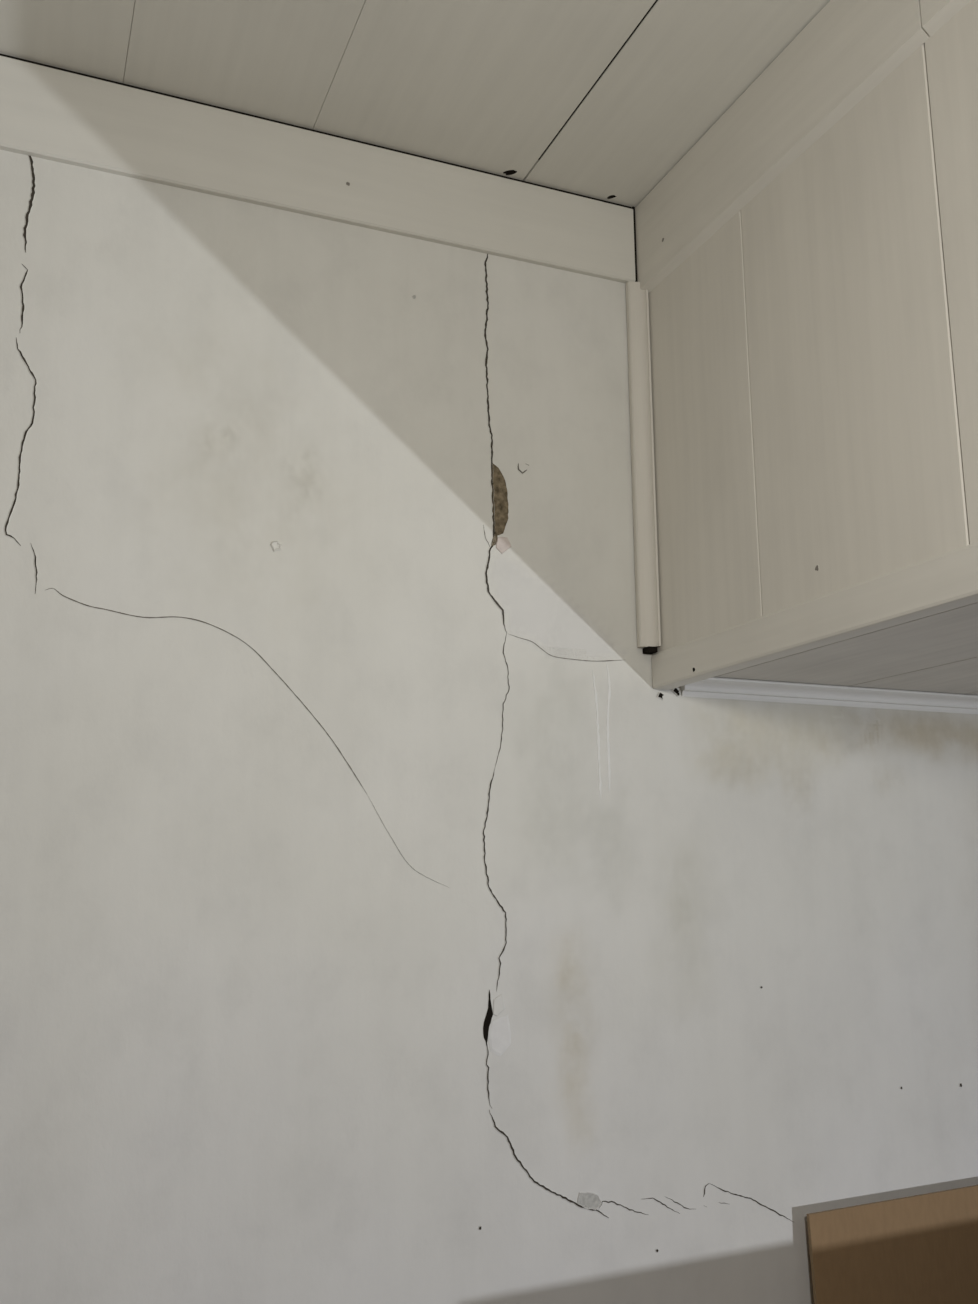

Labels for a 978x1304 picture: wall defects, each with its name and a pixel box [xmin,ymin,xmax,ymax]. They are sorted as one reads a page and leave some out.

crack [4,155,450,888]
flaking render [491,463,511,554]
crack [482,254,621,992]
flaking render [483,990,511,1056]
crack [485,1041,793,1222]